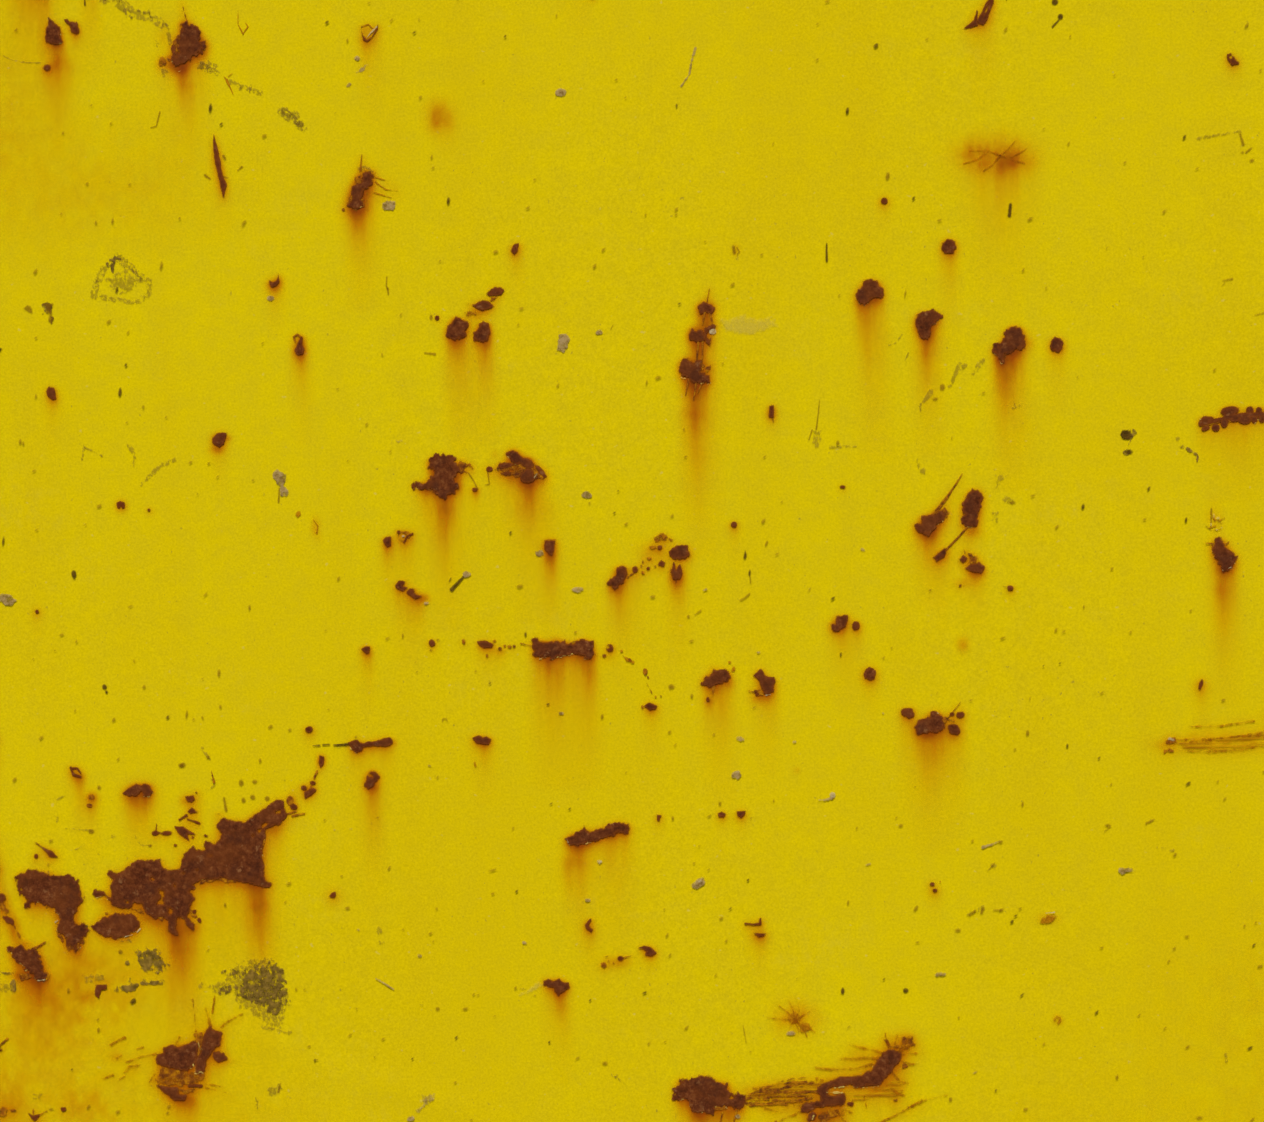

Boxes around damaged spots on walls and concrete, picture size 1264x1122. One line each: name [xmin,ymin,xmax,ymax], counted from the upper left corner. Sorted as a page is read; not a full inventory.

corrosion [159,7,208,89]
corrosion [430,287,504,356]
corrosion [678,289,716,435]
corrosion [992,326,1027,394]
corrosion [1198,406,1264,431]
corrosion [411,450,546,534]
corrosion [914,475,985,587]
corrosion [462,638,613,684]
corrosion [0,726,393,1007]
corrosion [565,822,630,865]
corrosion [129,998,232,1111]
corrosion [672,1036,921,1122]